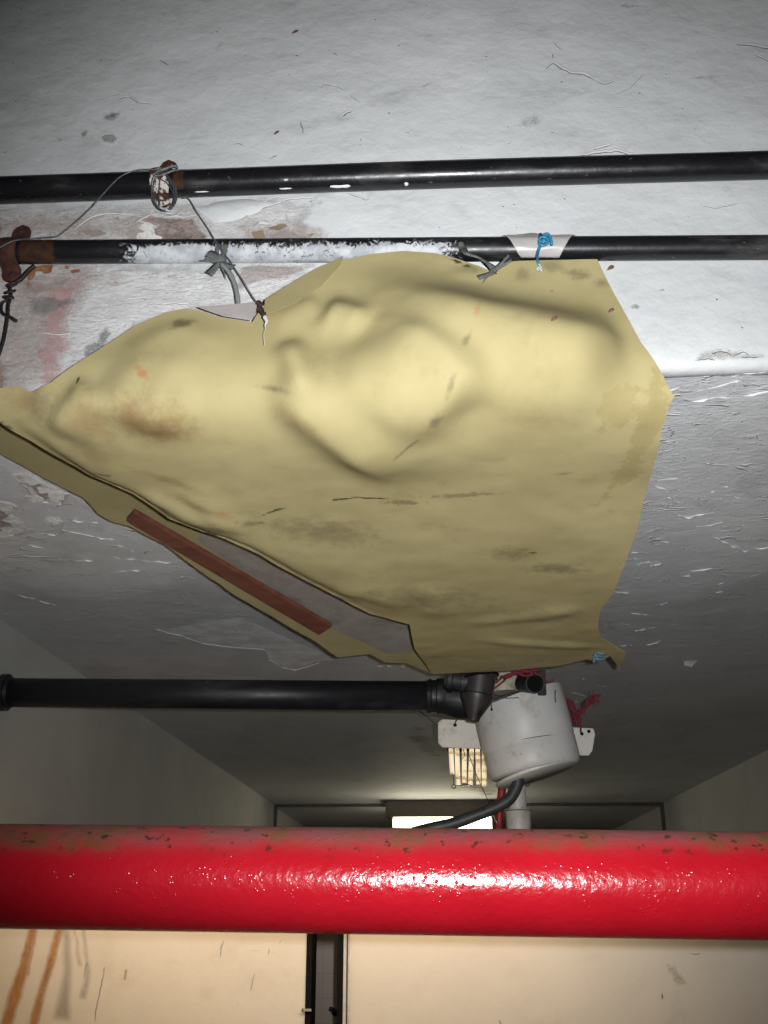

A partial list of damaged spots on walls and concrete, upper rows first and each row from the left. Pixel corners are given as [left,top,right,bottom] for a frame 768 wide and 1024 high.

peeling [0,200,316,240]
peeling [0,472,69,537]
peeling [156,618,338,671]